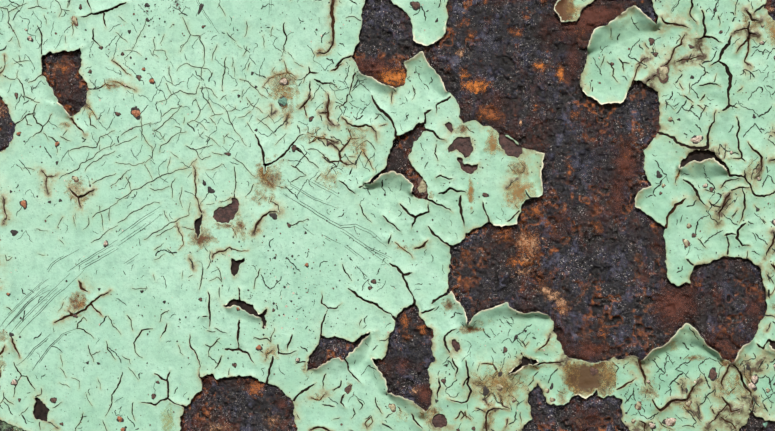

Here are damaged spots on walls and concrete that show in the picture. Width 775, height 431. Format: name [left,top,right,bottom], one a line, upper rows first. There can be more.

peeling [194,215,203,238]
peeling [213,198,239,223]
crack [0,0,576,431]
corrosion [351,0,775,431]
crack [590,0,775,431]